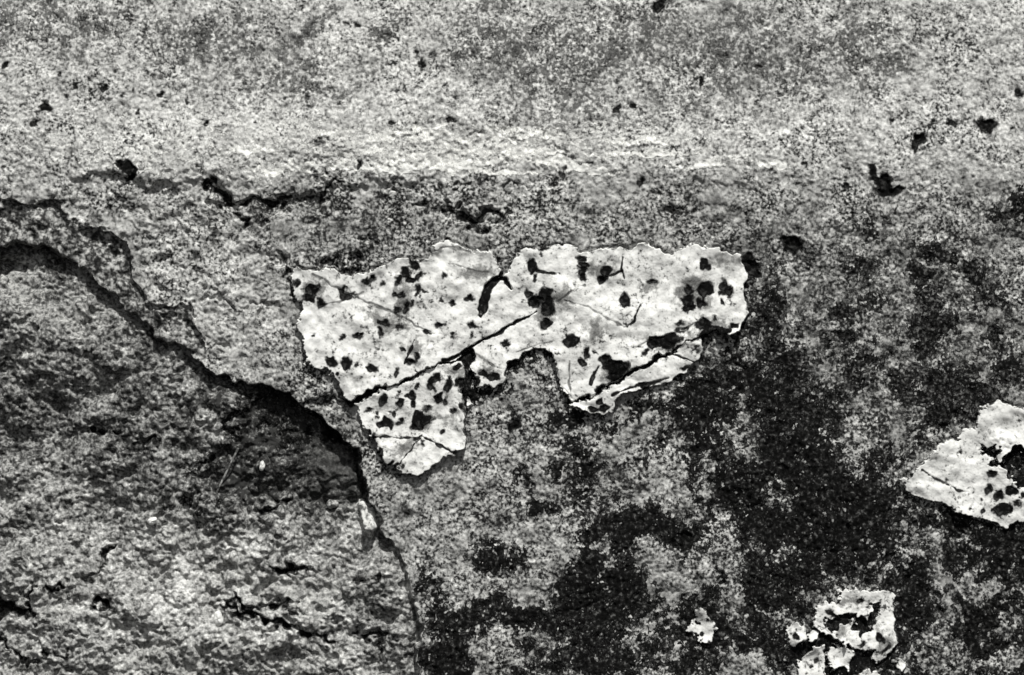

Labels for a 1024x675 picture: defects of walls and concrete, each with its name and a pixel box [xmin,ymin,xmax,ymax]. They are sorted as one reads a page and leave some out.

crack [280,145,706,409]
leakage [740,261,796,351]
leakage [812,209,1024,391]
leakage [461,349,555,416]
flaking render [290,239,761,477]
crack [370,435,455,468]
leakage [981,445,1024,489]
crack [0,581,70,667]
crack [90,544,117,611]
crack [209,563,389,654]
leakage [413,562,453,647]
leakage [524,618,675,675]